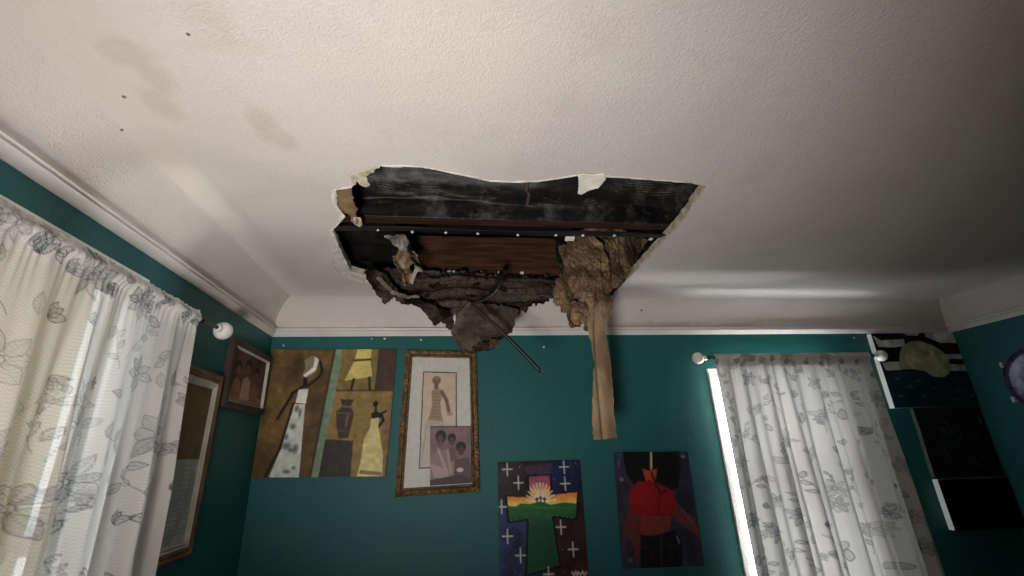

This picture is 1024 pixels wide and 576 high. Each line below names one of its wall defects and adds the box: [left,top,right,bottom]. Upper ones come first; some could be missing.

peeling [351,166,378,187]
peeling [578,173,606,195]
peeling [331,190,345,220]
peeling [331,234,371,285]